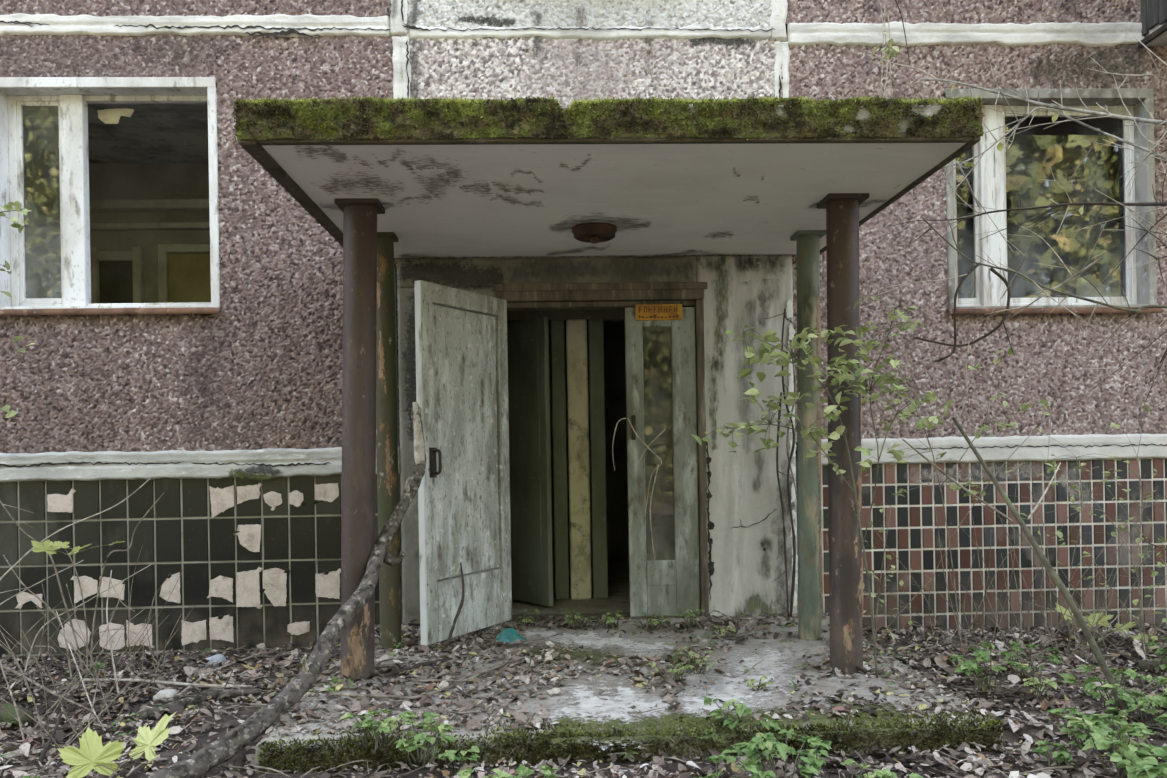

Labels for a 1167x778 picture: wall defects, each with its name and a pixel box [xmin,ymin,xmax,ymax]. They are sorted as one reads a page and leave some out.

rust [377,331,387,395]
spalling [47,488,76,513]
spalling [209,465,339,519]
rust [384,421,393,496]
water stain [753,453,764,490]
spalling [70,576,129,603]
spalling [181,567,290,646]
spalling [233,524,261,552]
spalling [315,569,341,599]
water stain [762,477,792,616]
rust [842,471,863,663]
rust [341,603,370,677]